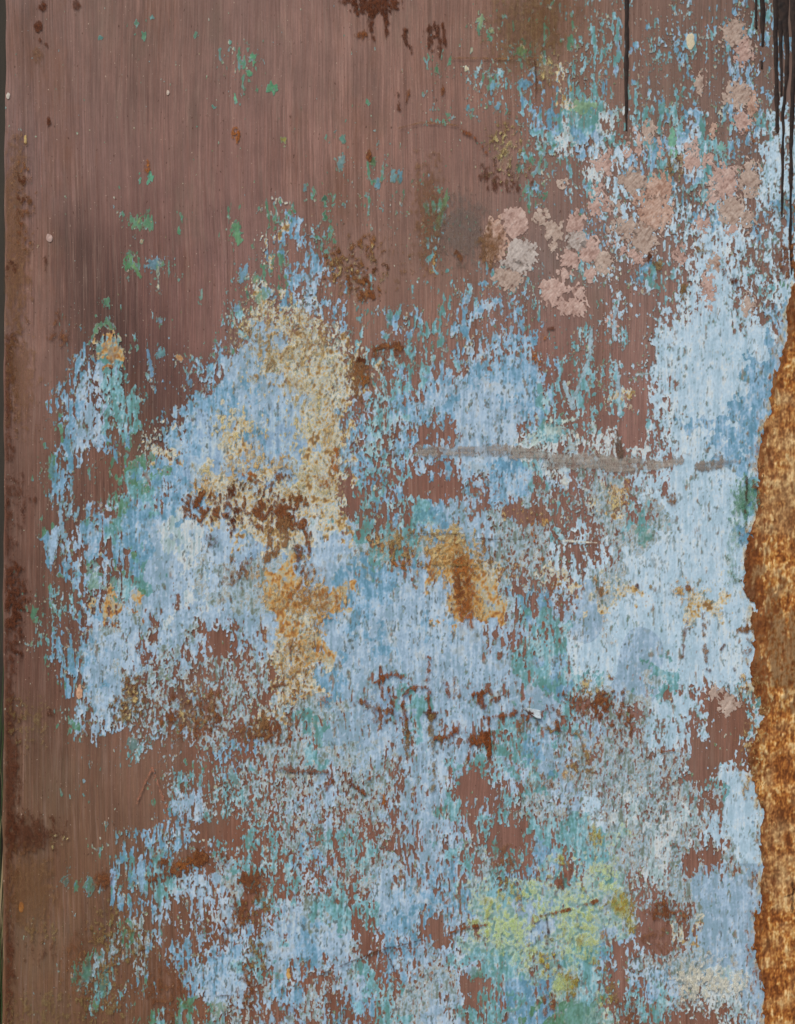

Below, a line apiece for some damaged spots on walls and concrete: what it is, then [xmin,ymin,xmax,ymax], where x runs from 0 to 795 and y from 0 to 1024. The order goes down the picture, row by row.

corrosion [342,0,399,41]
peeling [206,39,278,106]
peeling [113,186,189,295]
peeling [218,187,245,252]
peeling [323,129,410,232]
peeling [417,184,478,275]
corrosion [181,296,403,752]
corrosion [367,523,519,628]
corrosion [734,236,795,1024]
peeling [56,862,105,898]